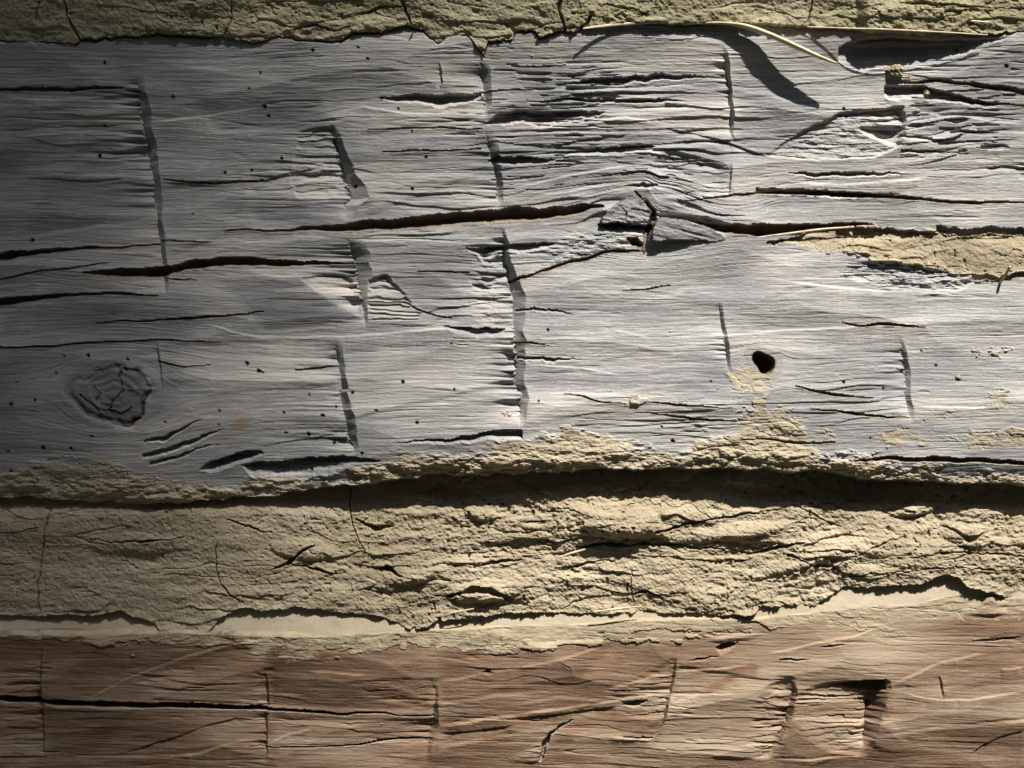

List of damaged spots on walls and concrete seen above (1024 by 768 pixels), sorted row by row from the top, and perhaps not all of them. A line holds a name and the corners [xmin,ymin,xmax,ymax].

crack [0,191,658,369]
peeling [840,263,970,291]
crack [80,371,141,416]
crack [270,545,342,576]
peeling [964,596,1004,616]
peeling [708,633,759,642]
crack [0,695,435,749]